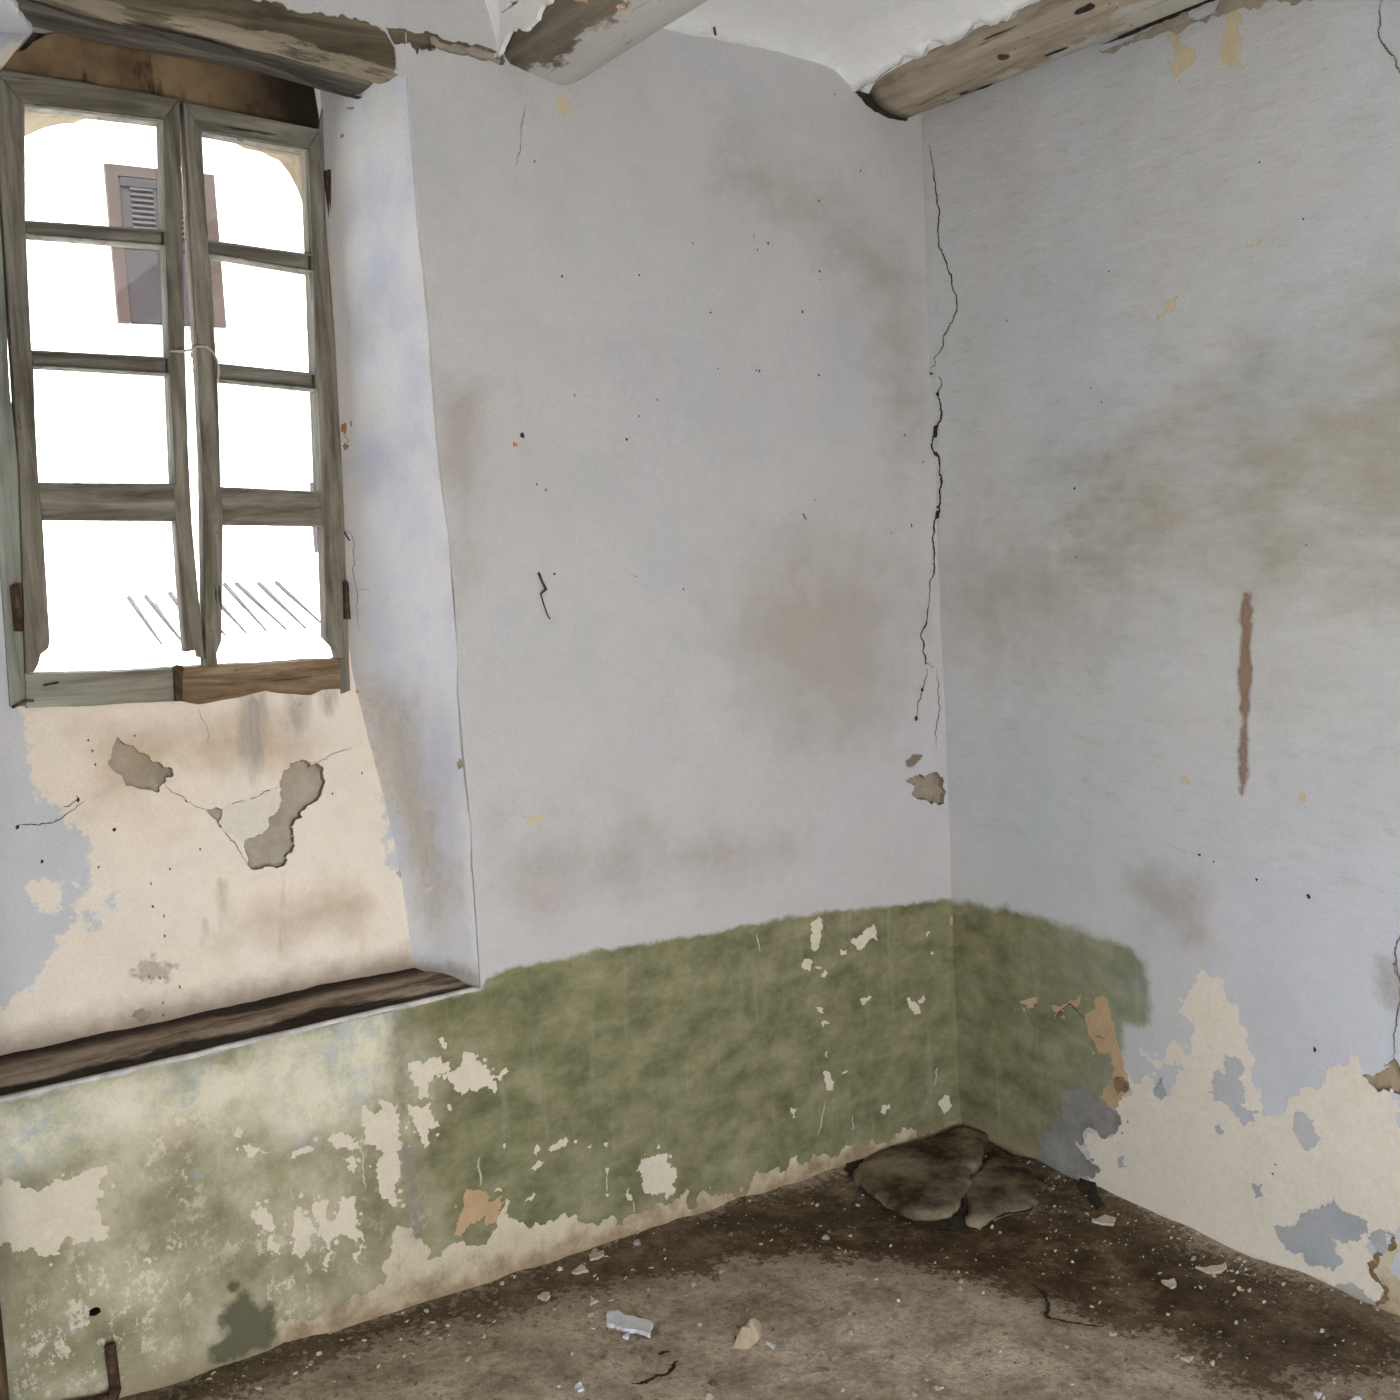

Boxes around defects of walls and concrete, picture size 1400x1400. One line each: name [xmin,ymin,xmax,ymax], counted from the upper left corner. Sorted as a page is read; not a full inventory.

crack [1377,0,1400,73]
crack [915,147,958,747]
corrosion [1238,593,1252,794]
crack [20,795,85,826]
spalling [108,737,173,793]
spalling [207,760,325,870]
spalling [906,772,946,805]
peeling [801,917,828,977]
crack [1392,937,1400,1059]
peeling [1020,969,1400,1316]
peeling [0,1165,115,1266]
peeling [251,1192,366,1272]